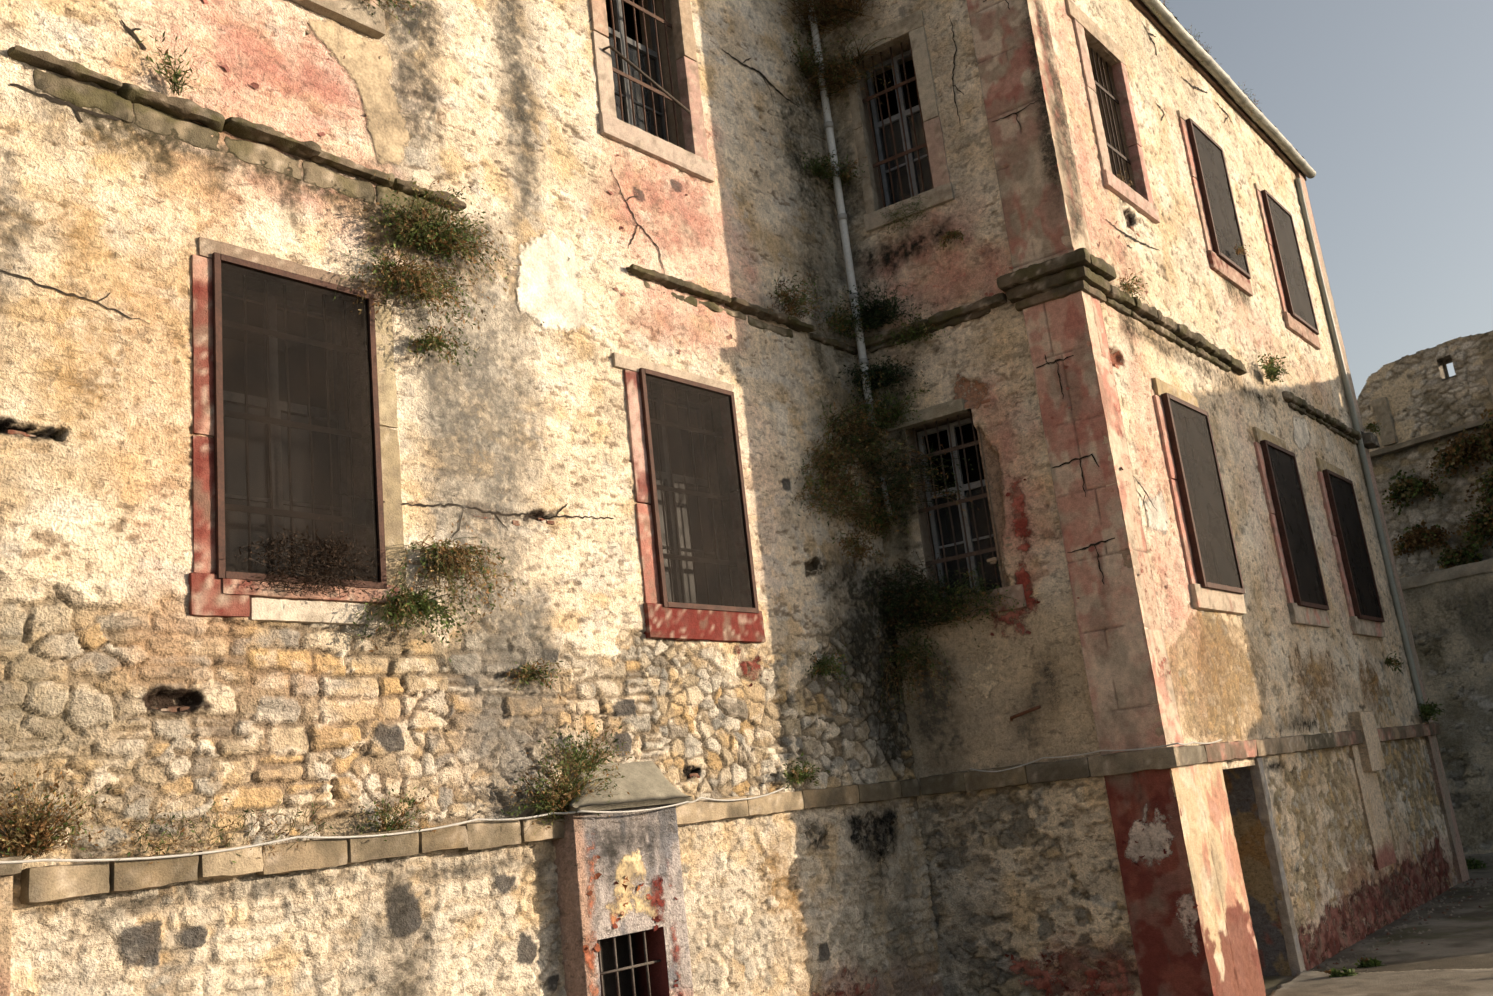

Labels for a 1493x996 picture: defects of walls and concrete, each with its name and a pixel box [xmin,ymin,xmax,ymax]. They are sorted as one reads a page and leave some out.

crack [722,49,799,107]
crack [611,169,665,274]
crack [0,269,149,324]
spalling [954,374,991,409]
crack [383,501,614,540]
spalling [976,427,1041,640]
flaking render [1122,804,1174,866]
peeling [583,842,683,996]
flaking render [1176,893,1202,956]
peeling [1298,834,1450,971]
peeling [811,965,879,996]
peeling [1005,943,1135,996]